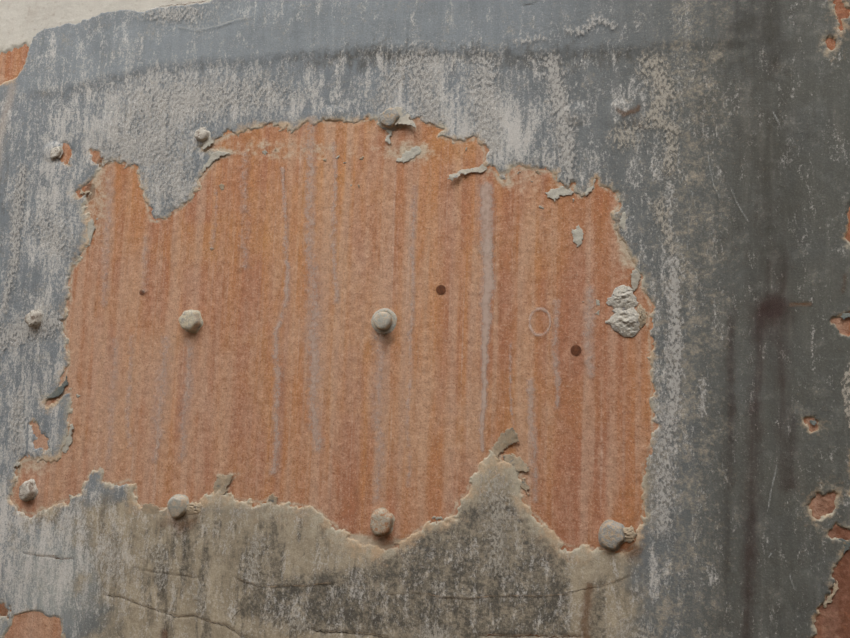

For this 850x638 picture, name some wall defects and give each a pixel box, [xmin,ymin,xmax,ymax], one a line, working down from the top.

peeling [10,106,658,553]